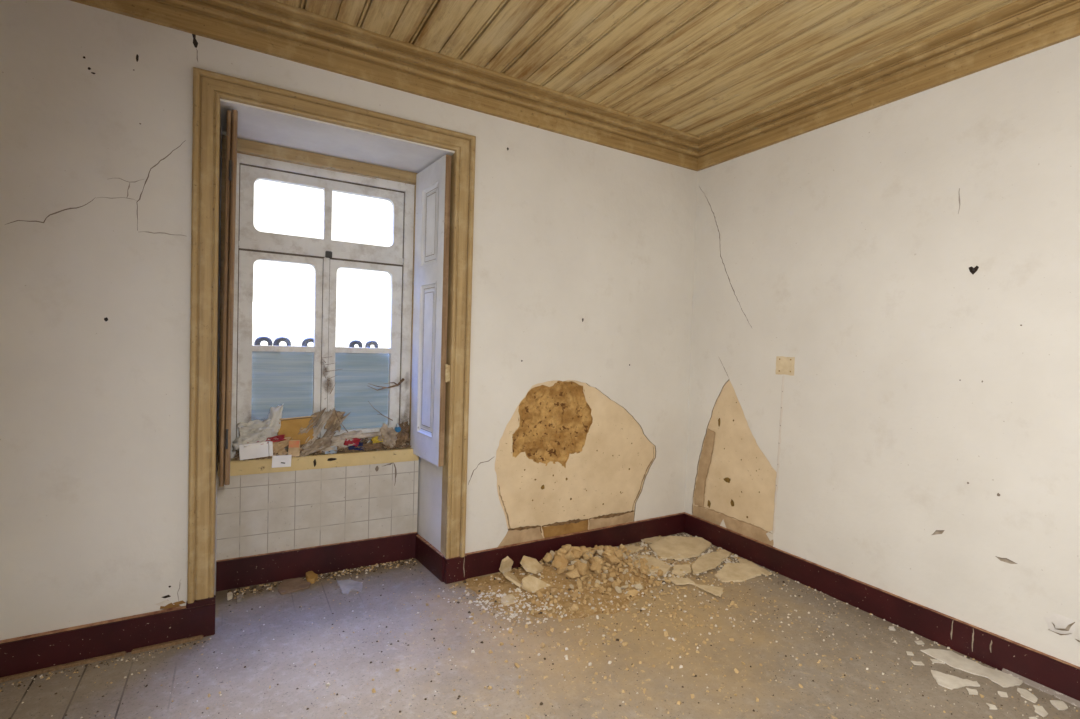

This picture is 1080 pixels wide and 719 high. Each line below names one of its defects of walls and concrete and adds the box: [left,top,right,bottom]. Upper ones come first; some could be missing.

crack [5,140,186,236]
crack [699,186,751,326]
flaking render [495,380,655,547]
flaking render [693,380,777,546]